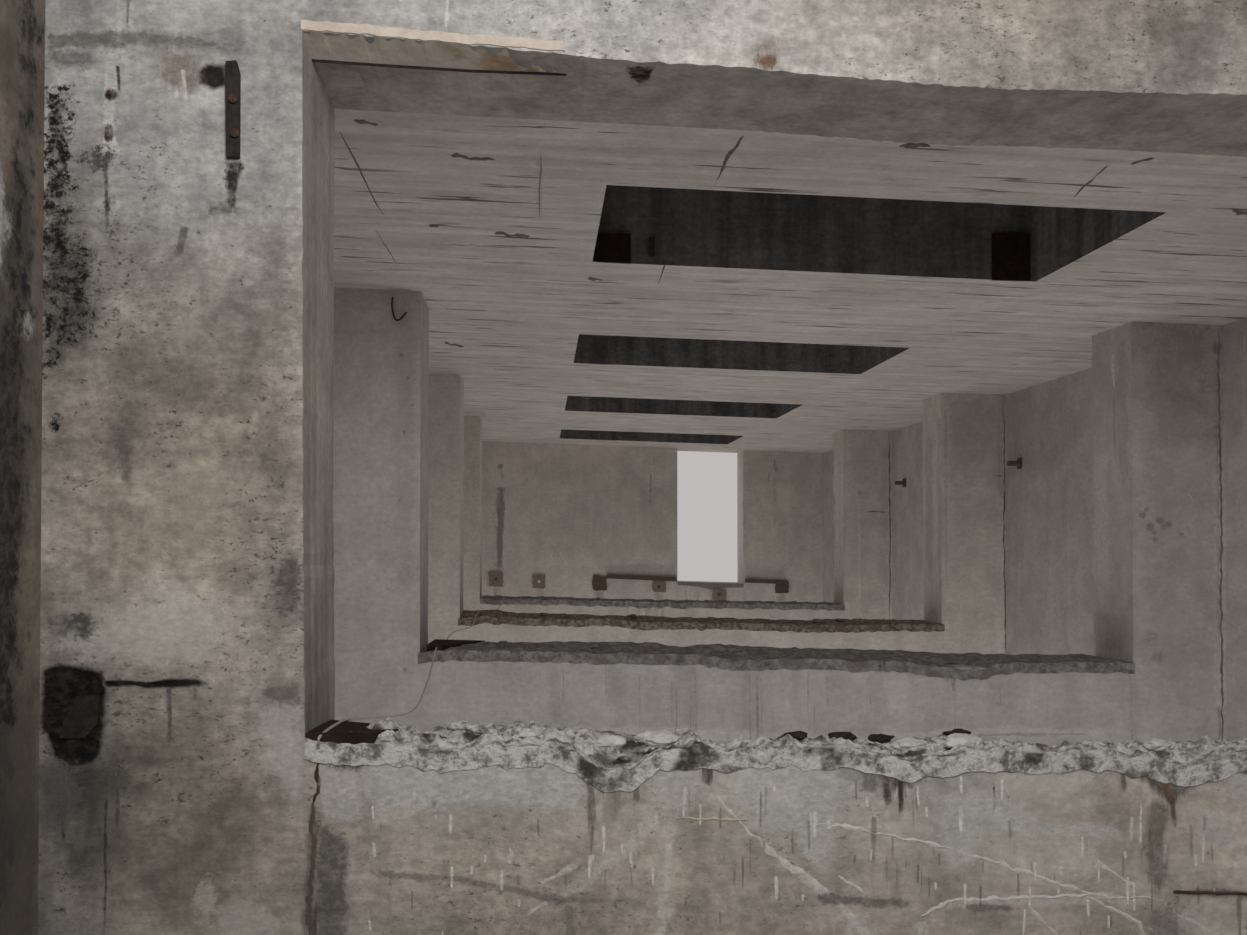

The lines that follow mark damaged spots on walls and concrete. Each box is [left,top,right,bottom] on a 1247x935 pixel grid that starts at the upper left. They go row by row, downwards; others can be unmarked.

leakage [0,0,216,921]
leakage [271,559,301,613]